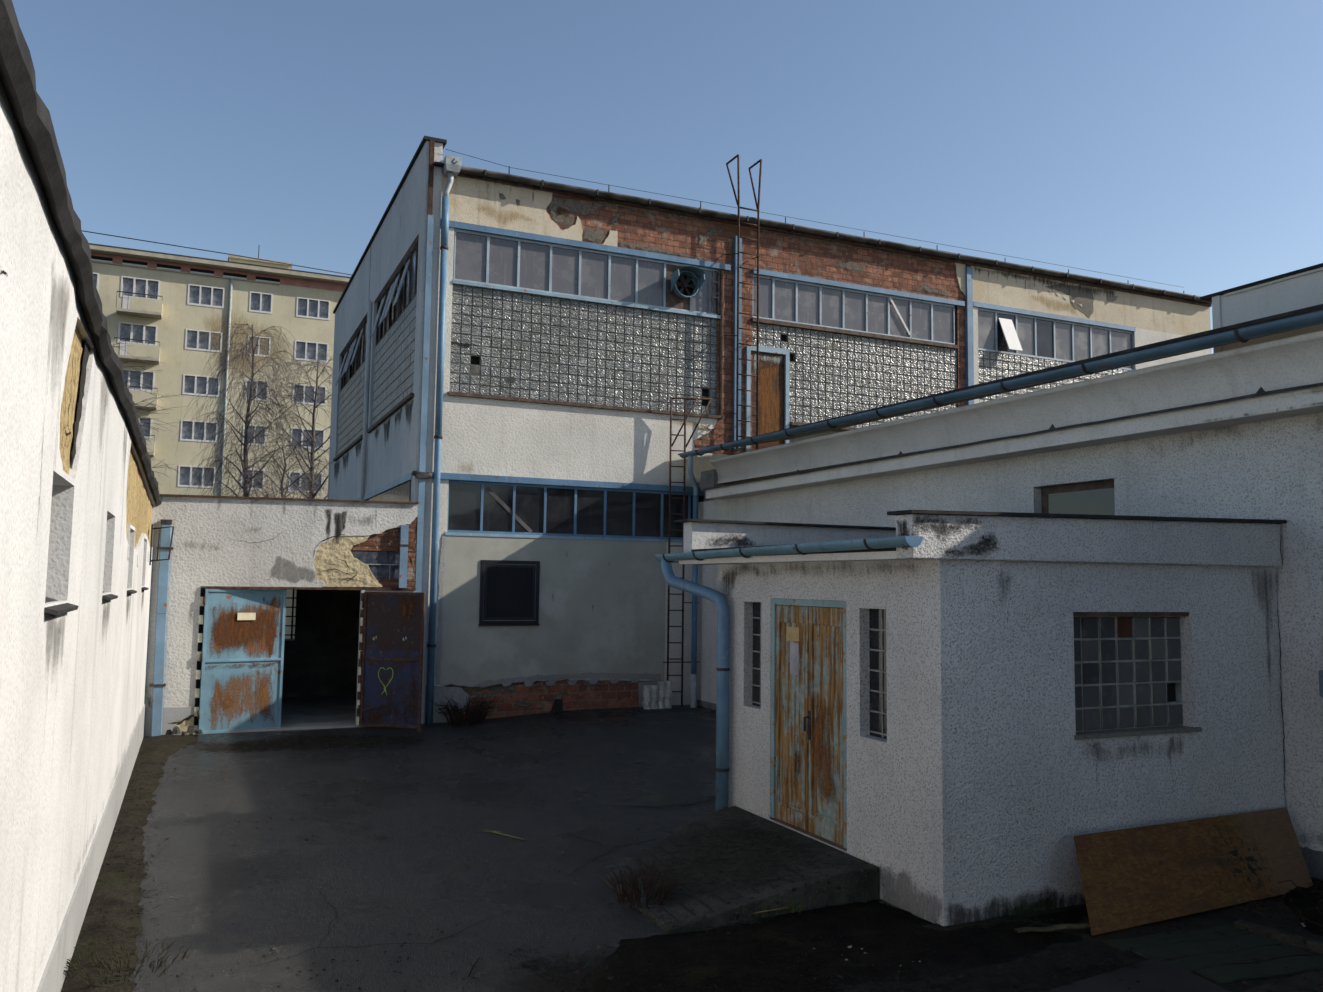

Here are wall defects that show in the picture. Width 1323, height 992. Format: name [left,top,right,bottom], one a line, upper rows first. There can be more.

flaking render [546,193,966,455]
spalling [271,517,417,588]
corrosion [207,598,280,729]
flaking render [464,672,661,720]
corrosion [795,701,835,804]